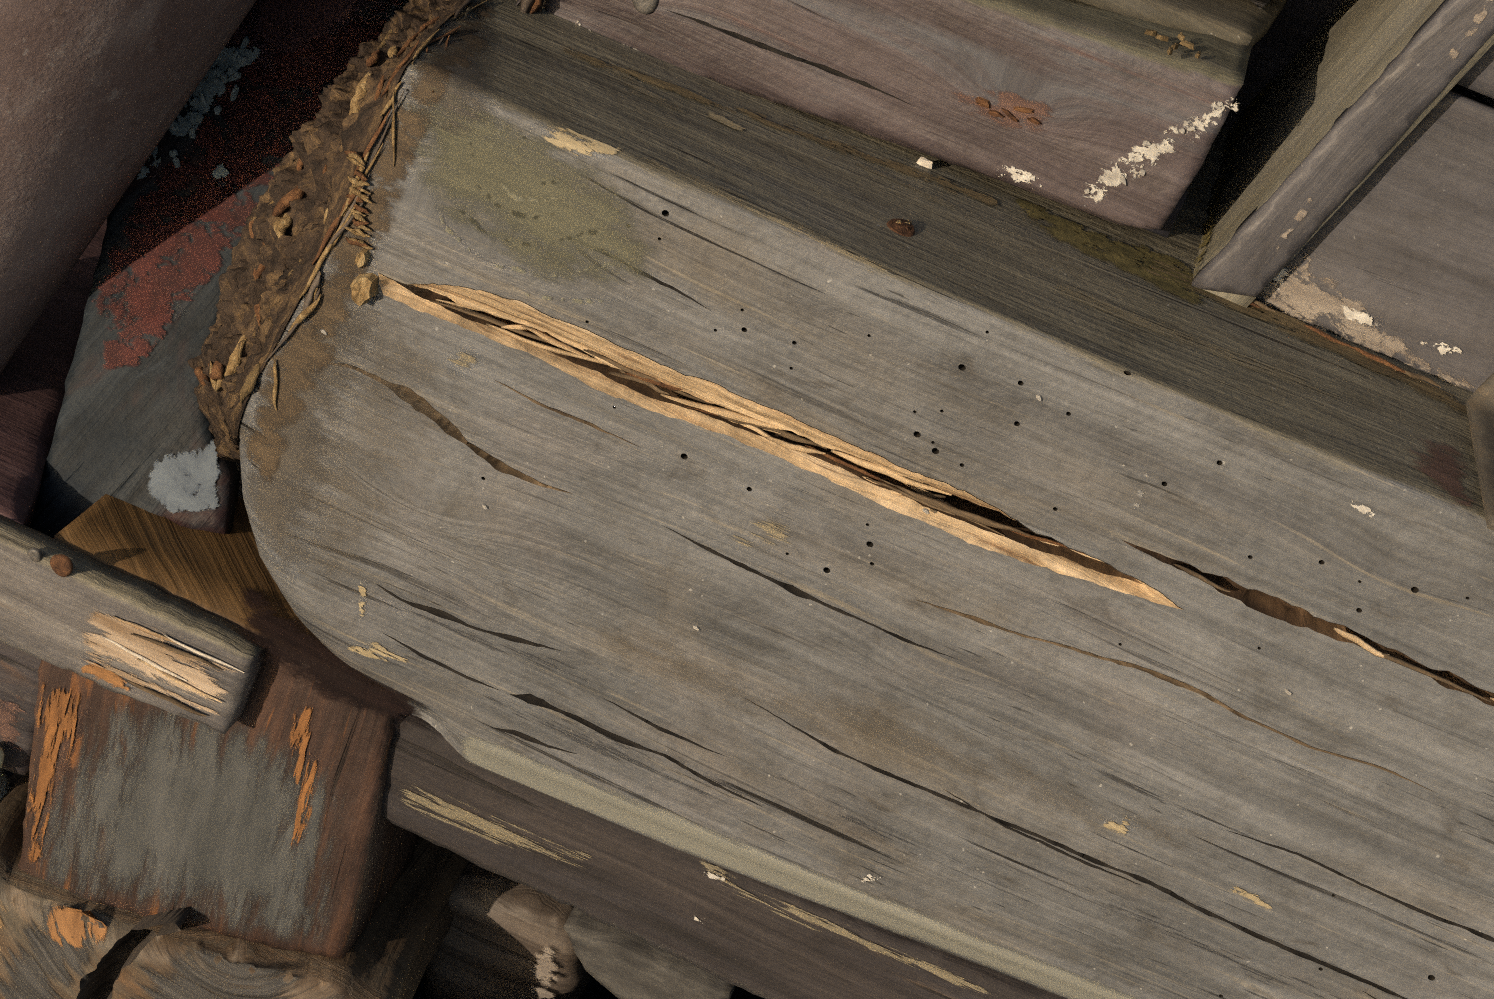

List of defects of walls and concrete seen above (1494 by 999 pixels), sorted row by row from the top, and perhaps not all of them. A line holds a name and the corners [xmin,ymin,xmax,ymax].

crack [595,250,704,307]
crack [327,363,572,494]
crack [378,273,1494,706]
crack [386,635,758,805]
crack [920,601,1429,790]
crack [76,906,191,999]